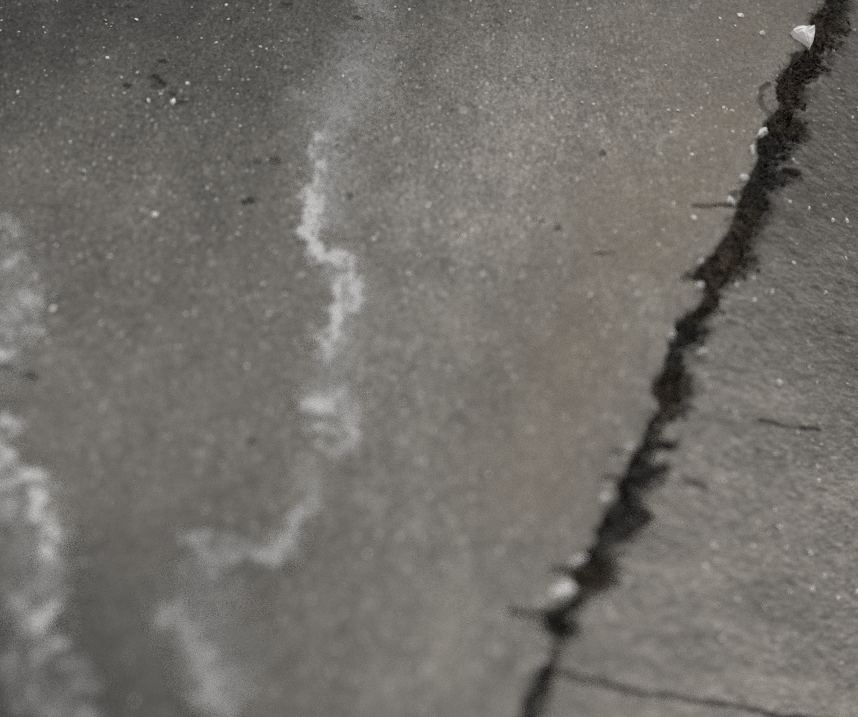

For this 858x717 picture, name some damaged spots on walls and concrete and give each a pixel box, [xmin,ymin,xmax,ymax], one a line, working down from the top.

water stain [0,288,42,363]
water stain [0,413,63,578]
water stain [301,388,359,453]
water stain [296,131,365,364]
crack [510,0,858,717]
water stain [18,599,61,637]